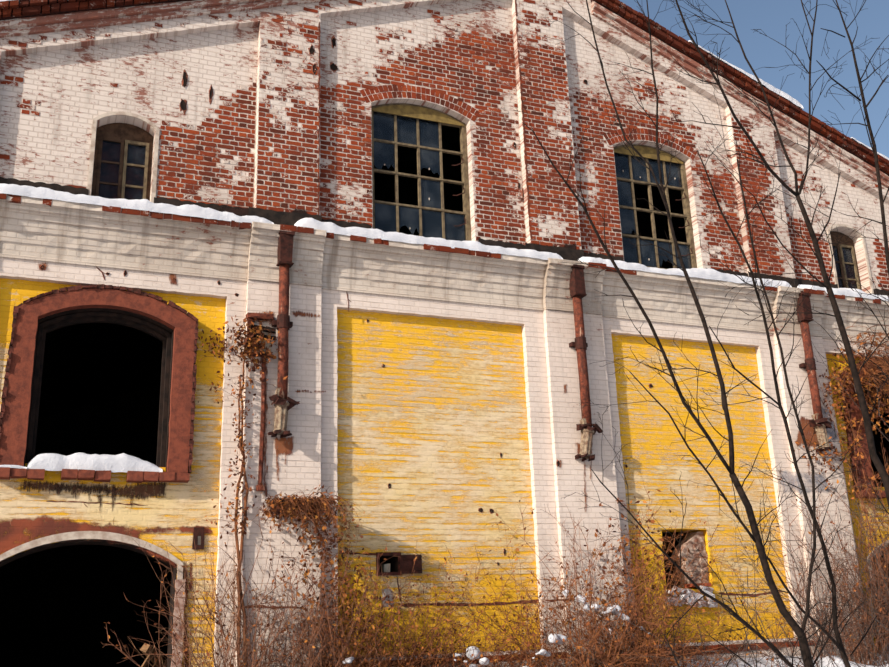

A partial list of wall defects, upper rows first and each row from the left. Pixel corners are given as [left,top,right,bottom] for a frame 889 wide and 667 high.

peeling [2,35,56,47]
peeling [0,75,23,86]
peeling [17,99,41,116]
peeling [157,0,835,284]
peeling [873,239,889,291]
rust [263,358,294,497]
rust [796,417,819,475]
damp [21,480,166,524]